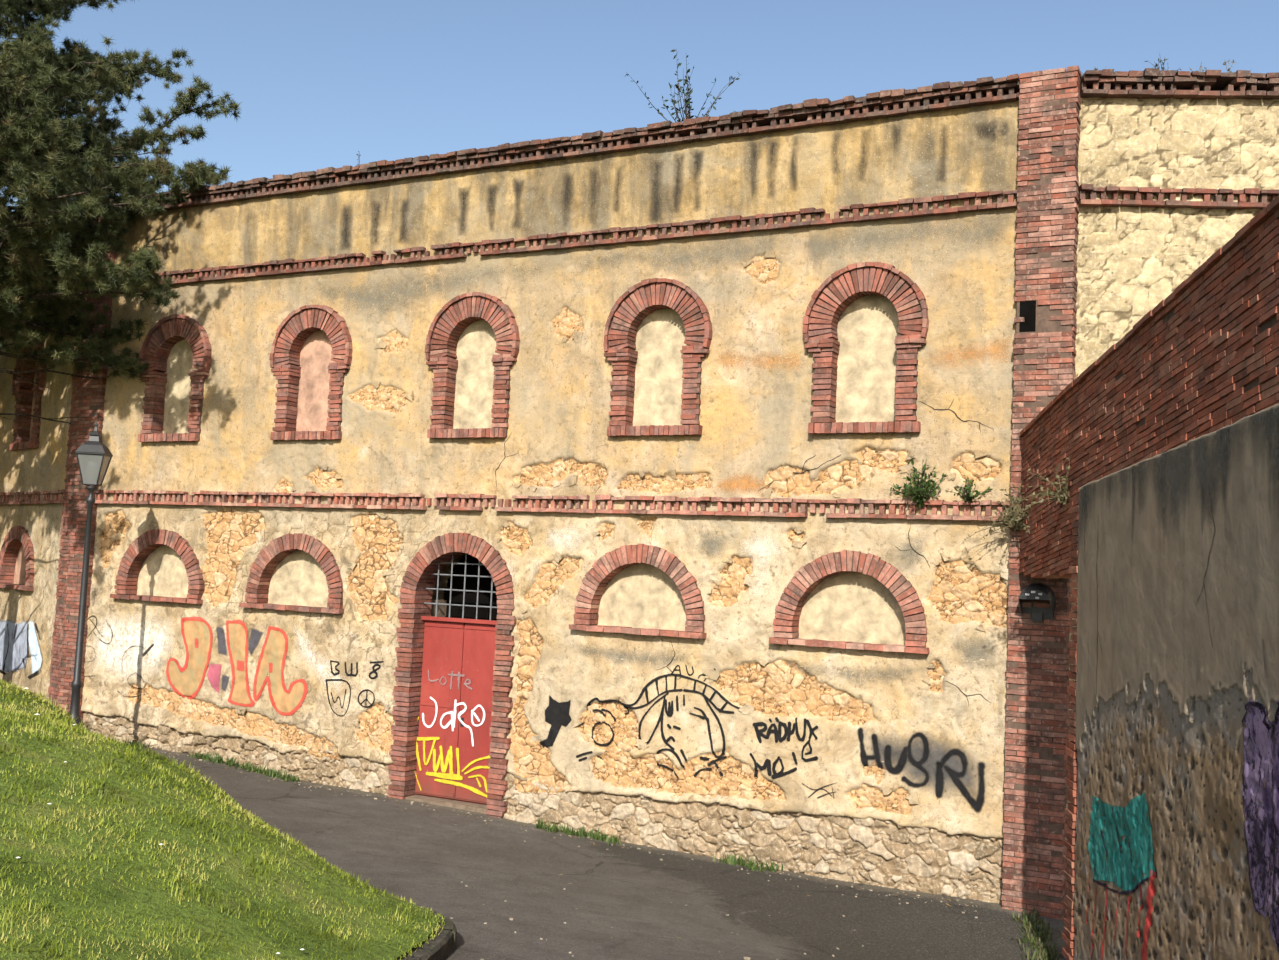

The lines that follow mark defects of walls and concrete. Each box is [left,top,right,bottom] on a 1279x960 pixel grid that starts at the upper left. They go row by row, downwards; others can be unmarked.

leakage [400,202,408,240]
leakage [460,190,468,231]
leakage [488,187,496,216]
leakage [675,152,701,207]
leakage [753,143,776,164]
crack [919,399,994,432]
spalling [763,447,915,499]
spalling [927,552,1011,632]
spalling [510,551,584,799]
spalling [702,658,878,726]
spalling [571,698,786,808]
spalling [1074,672,1279,960]